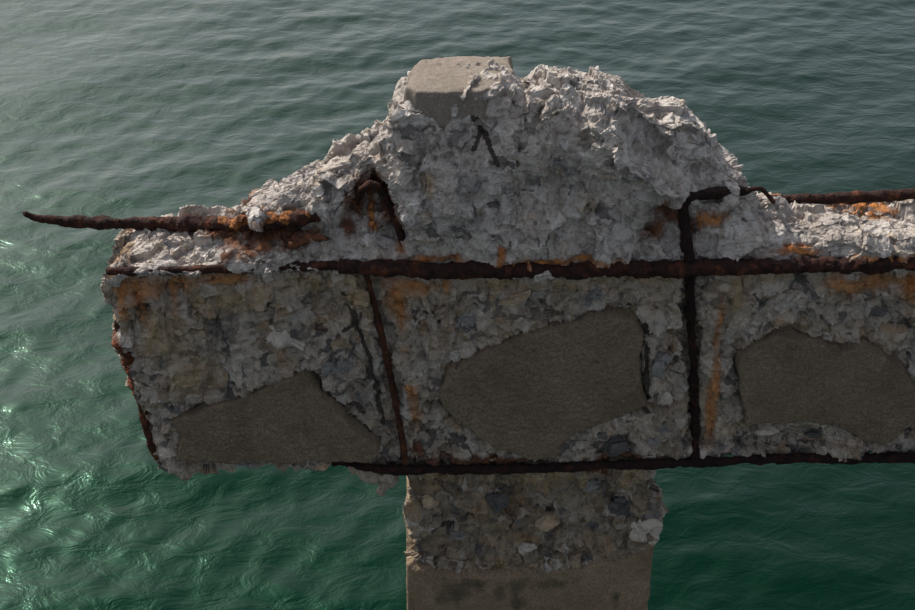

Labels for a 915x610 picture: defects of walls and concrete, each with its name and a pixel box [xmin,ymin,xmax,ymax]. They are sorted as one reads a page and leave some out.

corrosion [339,167,403,238]
corrosion [831,202,898,219]
corrosion [206,218,328,261]
corrosion [497,245,620,272]
corrosion [111,333,134,396]
spalling [100,228,915,575]
corrosion [409,442,536,466]